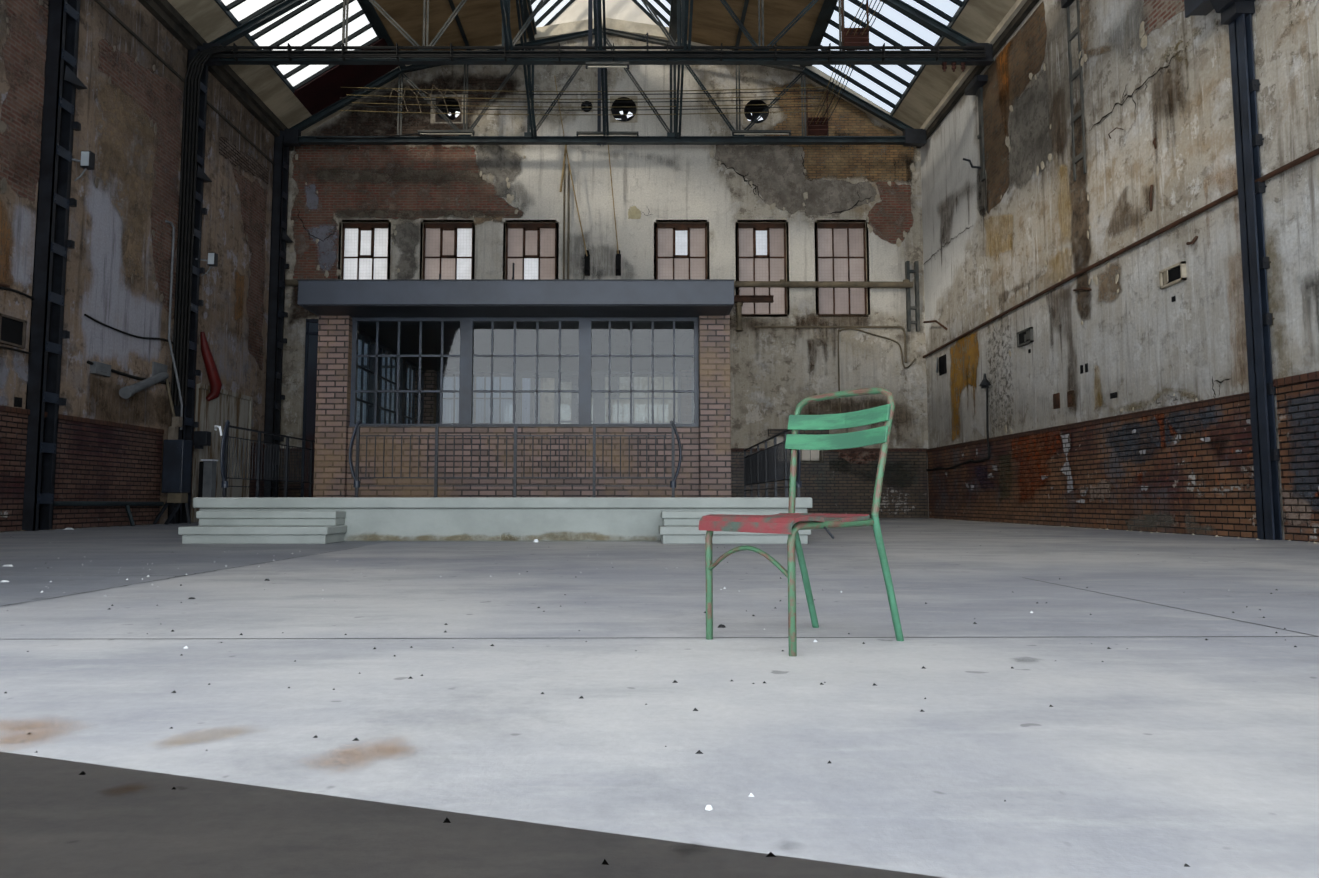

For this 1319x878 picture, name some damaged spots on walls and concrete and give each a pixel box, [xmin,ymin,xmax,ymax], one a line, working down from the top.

flaking render [219,137,269,370]
flaking render [288,74,526,323]
flaking render [709,83,915,247]
flaking render [982,1,1053,217]
flaking render [1059,0,1121,325]
flaking render [1139,0,1185,50]